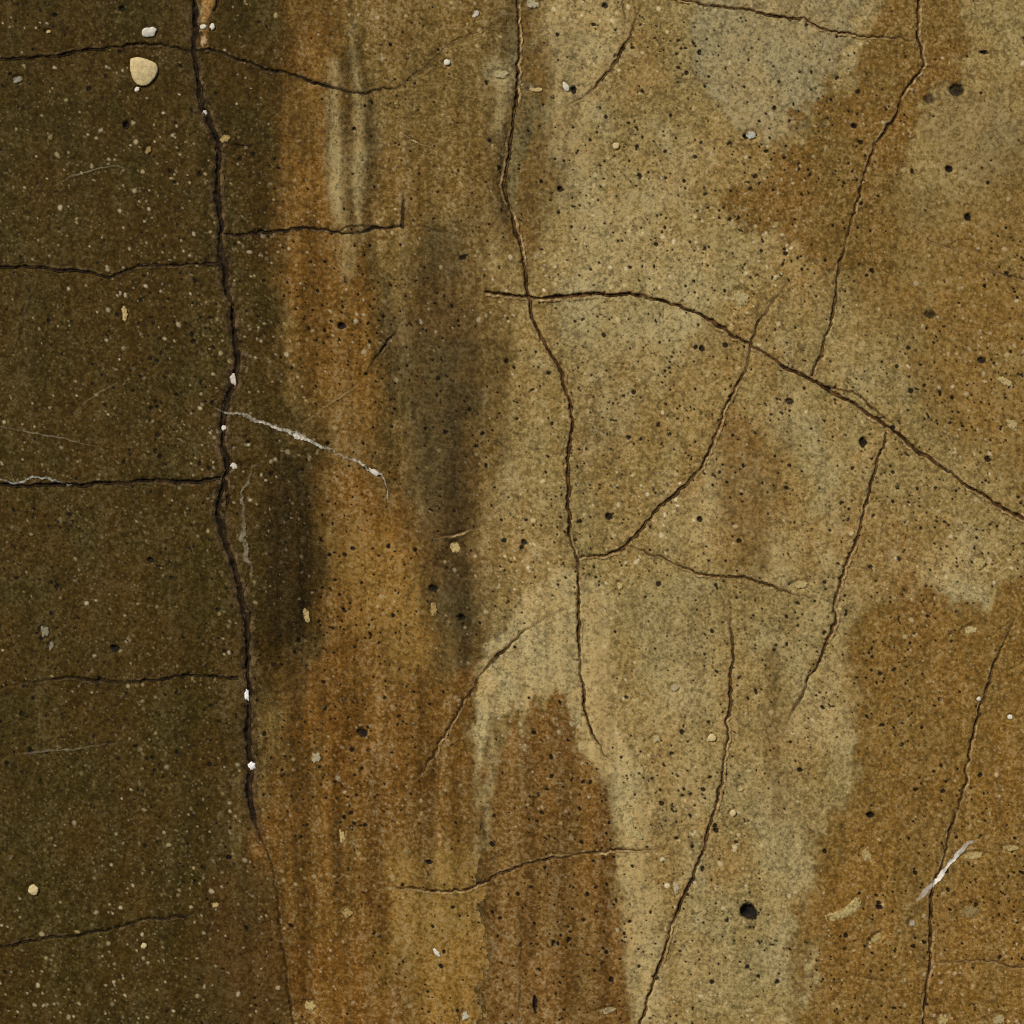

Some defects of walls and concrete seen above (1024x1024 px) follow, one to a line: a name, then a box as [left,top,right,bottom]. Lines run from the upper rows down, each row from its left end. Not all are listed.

crack [0,0,404,1024]
damp [223,0,668,1024]
crack [443,528,471,538]
crack [424,627,529,770]
crack [396,848,648,894]
crack [637,616,734,1024]
crack [486,0,1024,754]
crack [920,631,1024,1024]